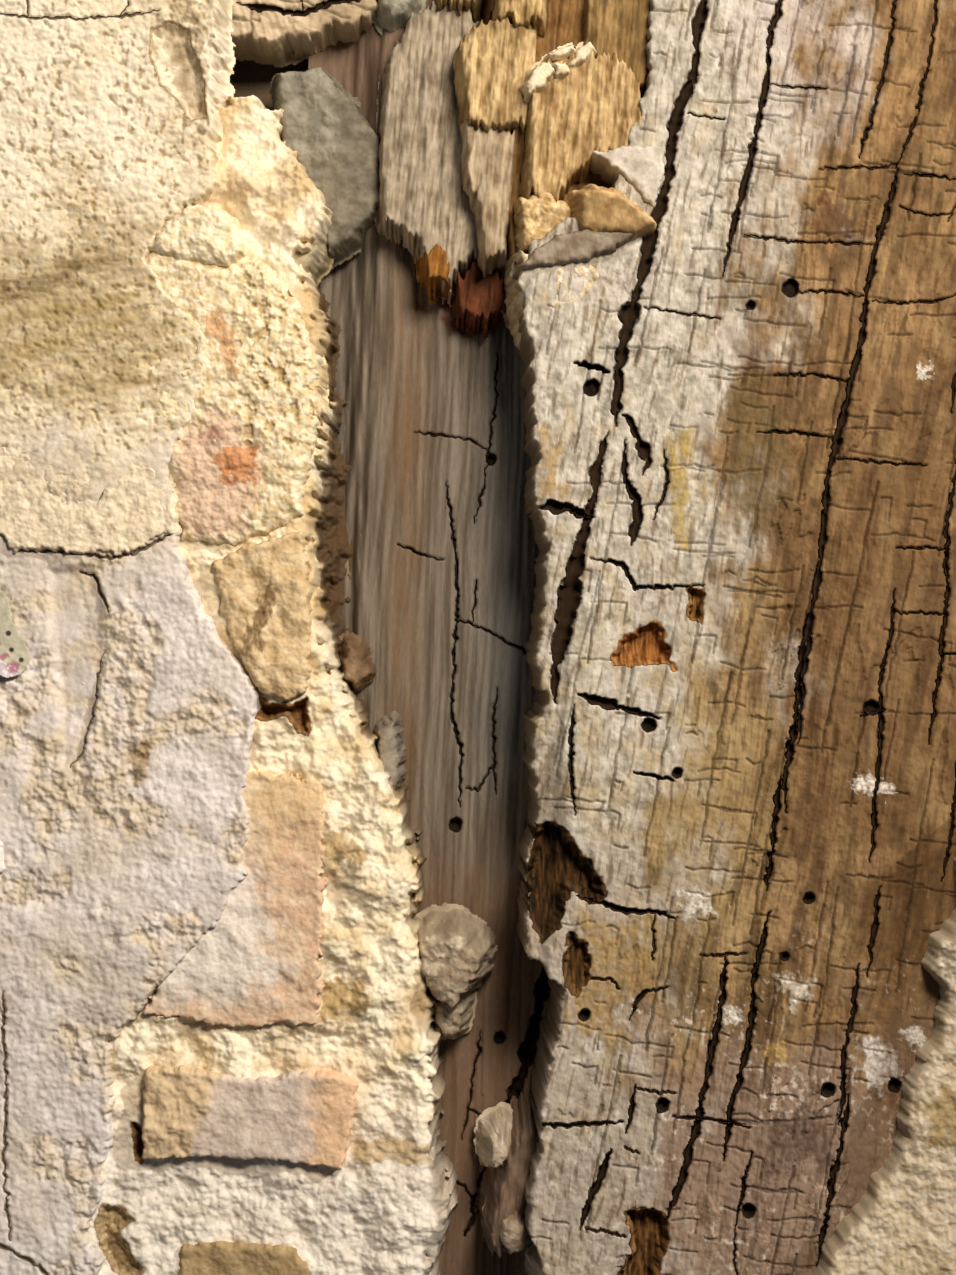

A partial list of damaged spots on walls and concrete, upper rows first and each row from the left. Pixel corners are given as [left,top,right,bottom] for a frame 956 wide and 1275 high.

crack [0,0,159,20]
crack [236,0,359,16]
crack [397,0,725,815]
spalling [212,446,261,486]
crack [18,535,170,613]
crack [461,0,956,1275]
spalling [255,697,312,736]
crack [456,1170,485,1236]